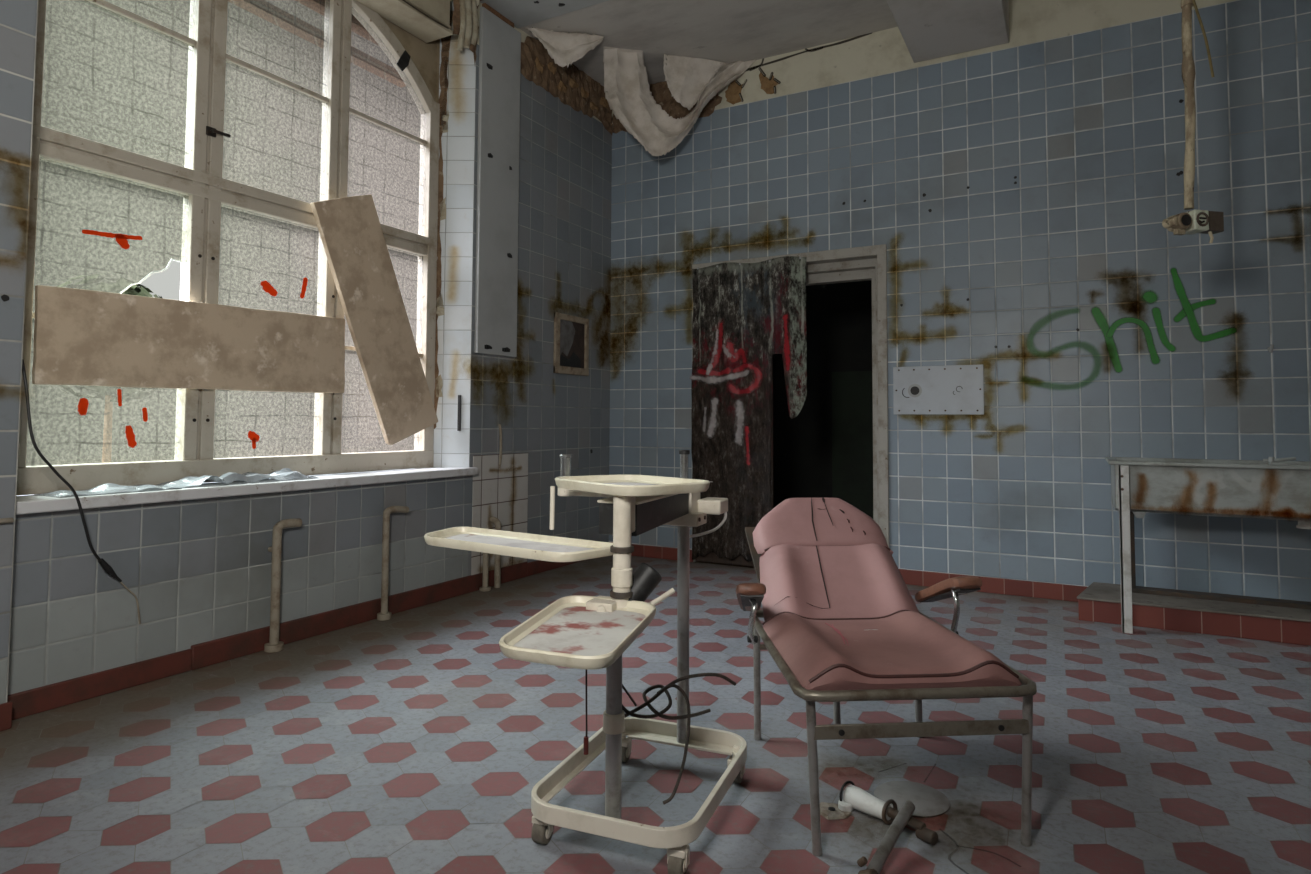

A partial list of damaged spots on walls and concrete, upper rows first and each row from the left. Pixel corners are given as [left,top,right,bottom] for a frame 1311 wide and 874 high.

spalling [520,36,627,135]
spalling [649,67,781,119]